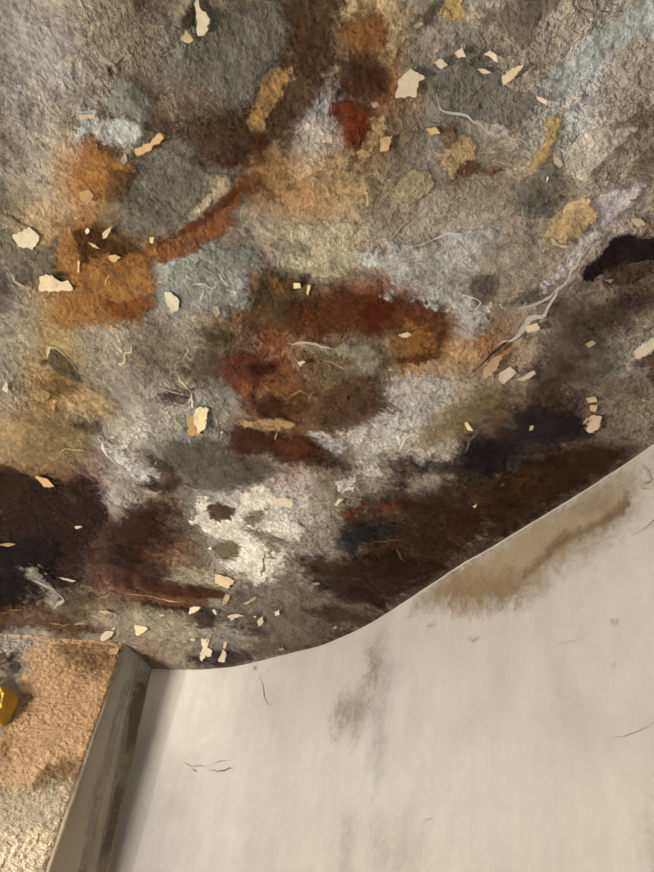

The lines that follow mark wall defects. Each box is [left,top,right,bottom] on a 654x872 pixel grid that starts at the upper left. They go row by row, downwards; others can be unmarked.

corrosion [43,0,412,331]
peeling [390,42,654,249]
spalling [38,272,73,292]
peeling [154,343,210,436]
peeling [150,238,263,318]
leakage [281,339,462,504]
leakage [266,221,495,343]
leakage [414,157,654,481]
spalling [581,218,654,285]
peeling [91,566,264,662]
leakage [0,409,377,666]
leakage [0,637,119,829]